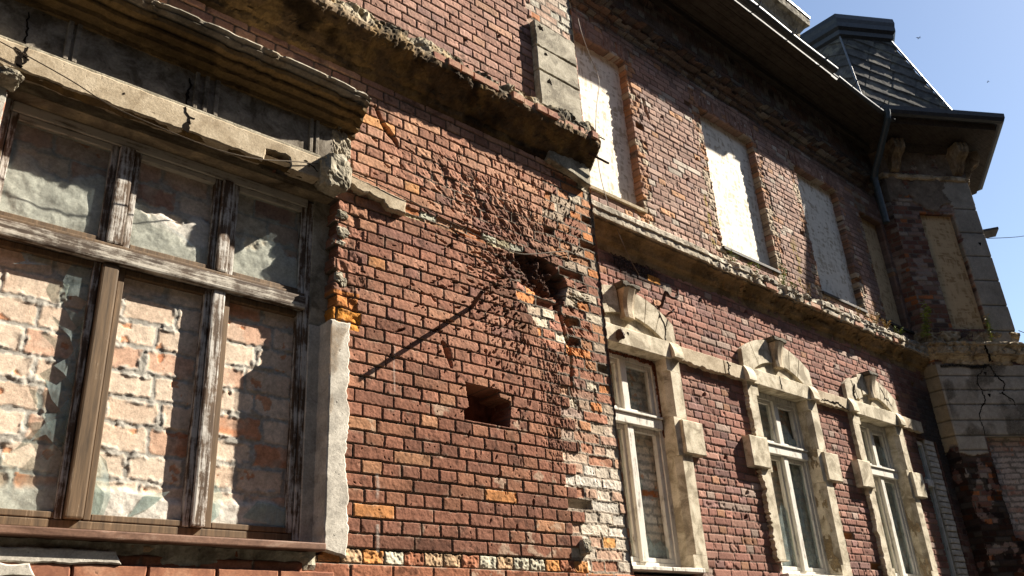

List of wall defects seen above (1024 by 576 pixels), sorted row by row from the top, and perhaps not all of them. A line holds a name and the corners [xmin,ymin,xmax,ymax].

flaking render [433,51,599,140]
peeling [330,126,352,161]
crack [976,341,1016,433]